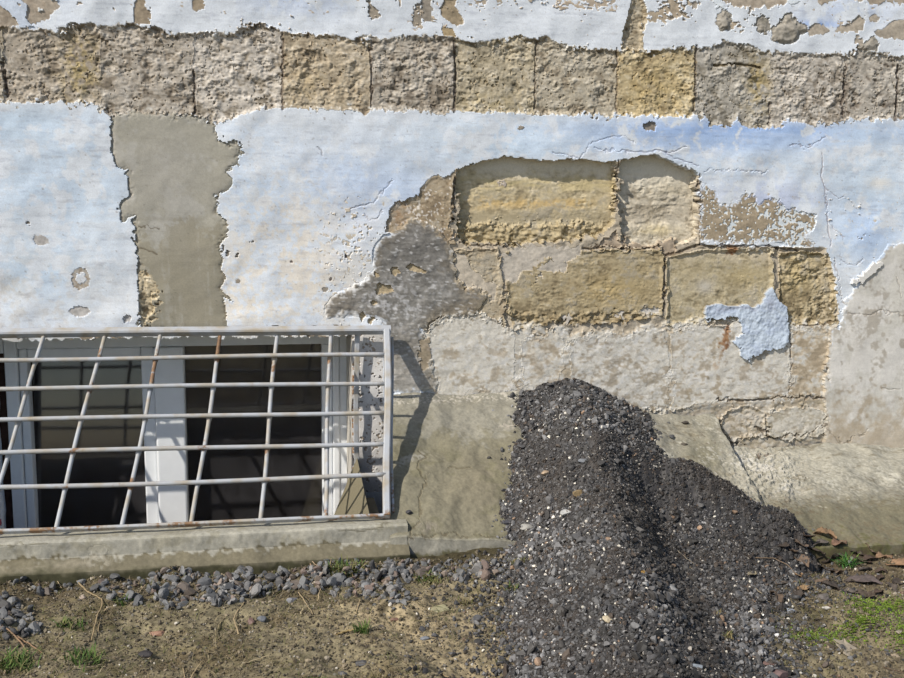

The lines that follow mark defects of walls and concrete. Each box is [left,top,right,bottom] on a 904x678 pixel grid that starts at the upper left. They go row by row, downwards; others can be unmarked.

spalling [0,0,904,131]
spalling [123,270,163,327]
peeling [318,200,373,296]
spalling [382,154,840,449]
crack [716,137,904,403]
crack [729,423,865,460]
crack [338,450,501,548]